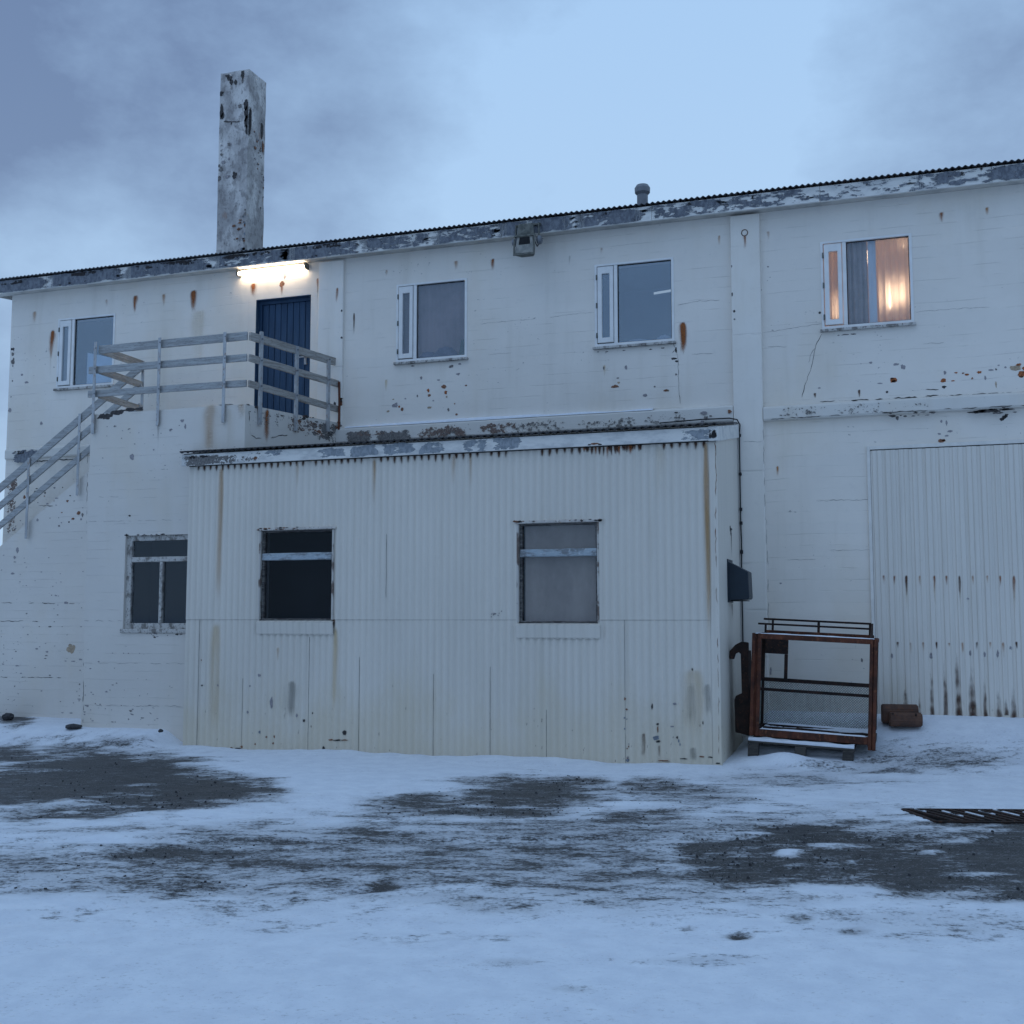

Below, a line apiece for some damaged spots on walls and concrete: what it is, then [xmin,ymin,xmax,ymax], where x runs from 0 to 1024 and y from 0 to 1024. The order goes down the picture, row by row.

peeling [0,163,1024,293]
peeling [184,365,563,467]
peeling [578,411,717,440]
crack [745,324,1024,562]
rust [931,676,1016,718]